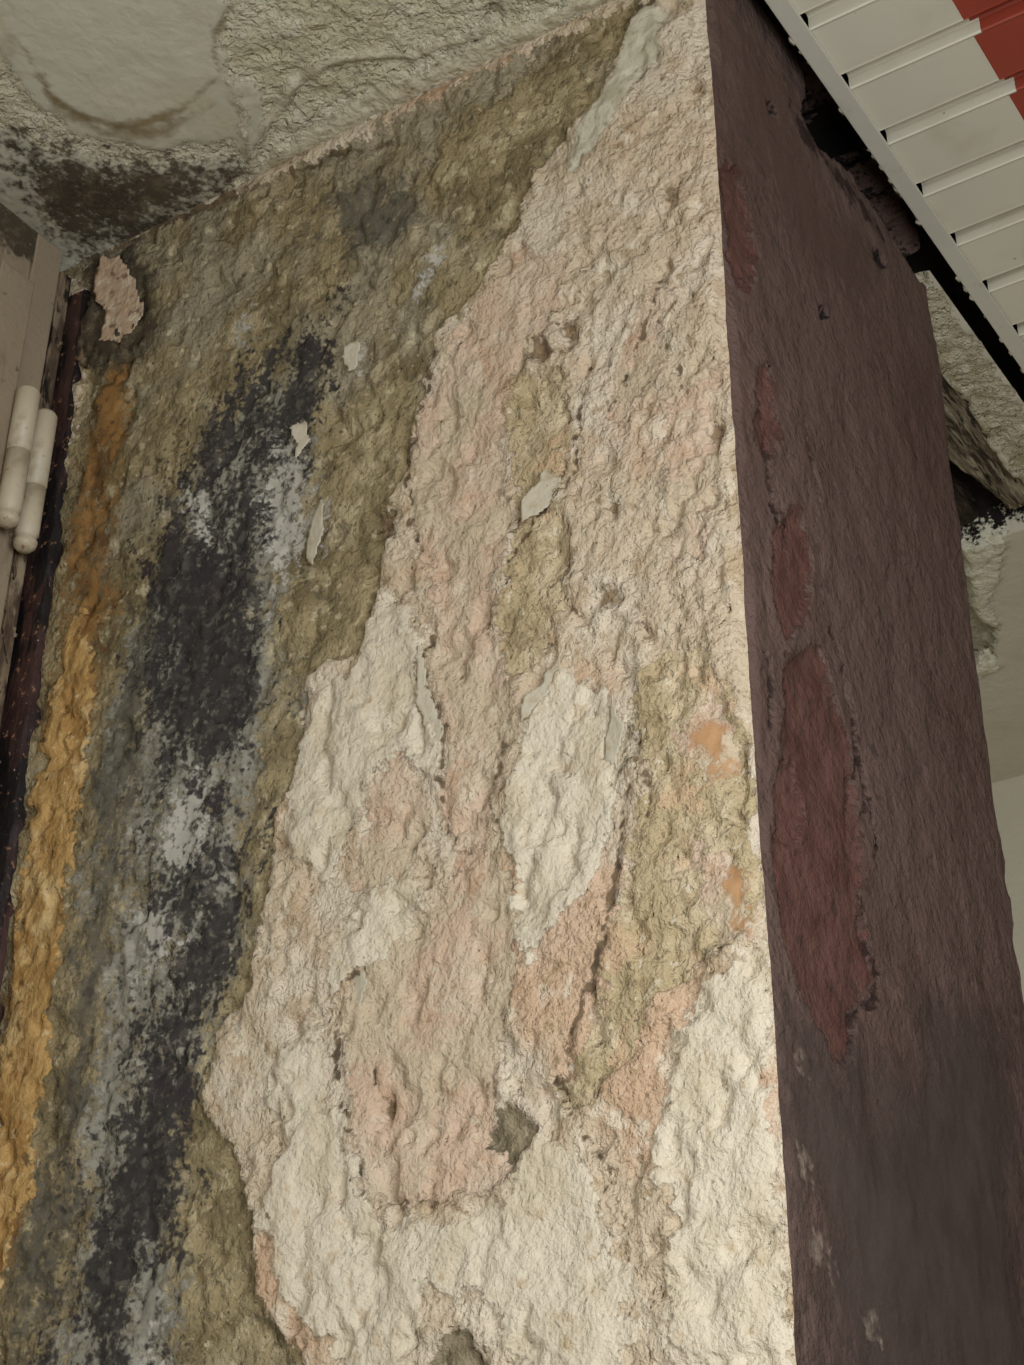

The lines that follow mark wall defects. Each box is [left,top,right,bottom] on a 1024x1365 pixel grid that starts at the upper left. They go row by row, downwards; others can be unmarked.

rust [52,357,136,736]
damp [0,89,249,385]
damp [5,172,419,1365]
crack [332,967,456,1207]
flaking render [0,0,793,1365]
damp [401,227,458,314]
crack [422,635,472,854]
crack [508,272,689,566]
crack [554,723,652,1175]
peeling [771,635,873,1063]
flaking render [915,271,1024,484]
spalling [949,459,1024,679]